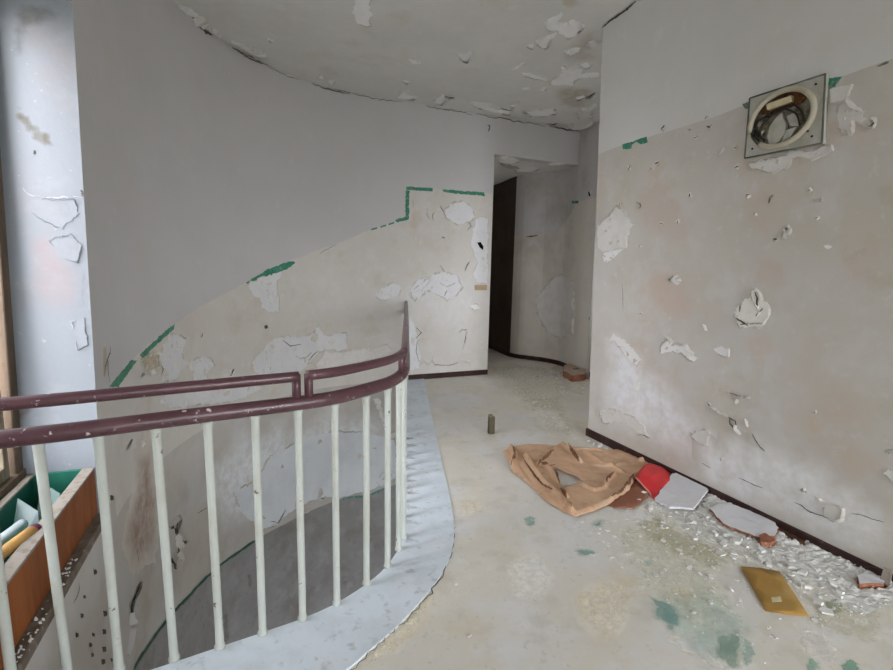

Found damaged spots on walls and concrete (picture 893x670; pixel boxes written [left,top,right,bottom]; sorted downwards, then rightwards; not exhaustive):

crack [232,46,293,78]
peeling [522,12,601,90]
water stain [15,97,54,148]
peeling [829,84,877,136]
peeling [733,144,834,174]
peeling [375,201,489,303]
peeling [597,202,634,264]
flaking render [733,286,771,330]
peeling [252,323,393,375]
water stain [122,440,160,575]